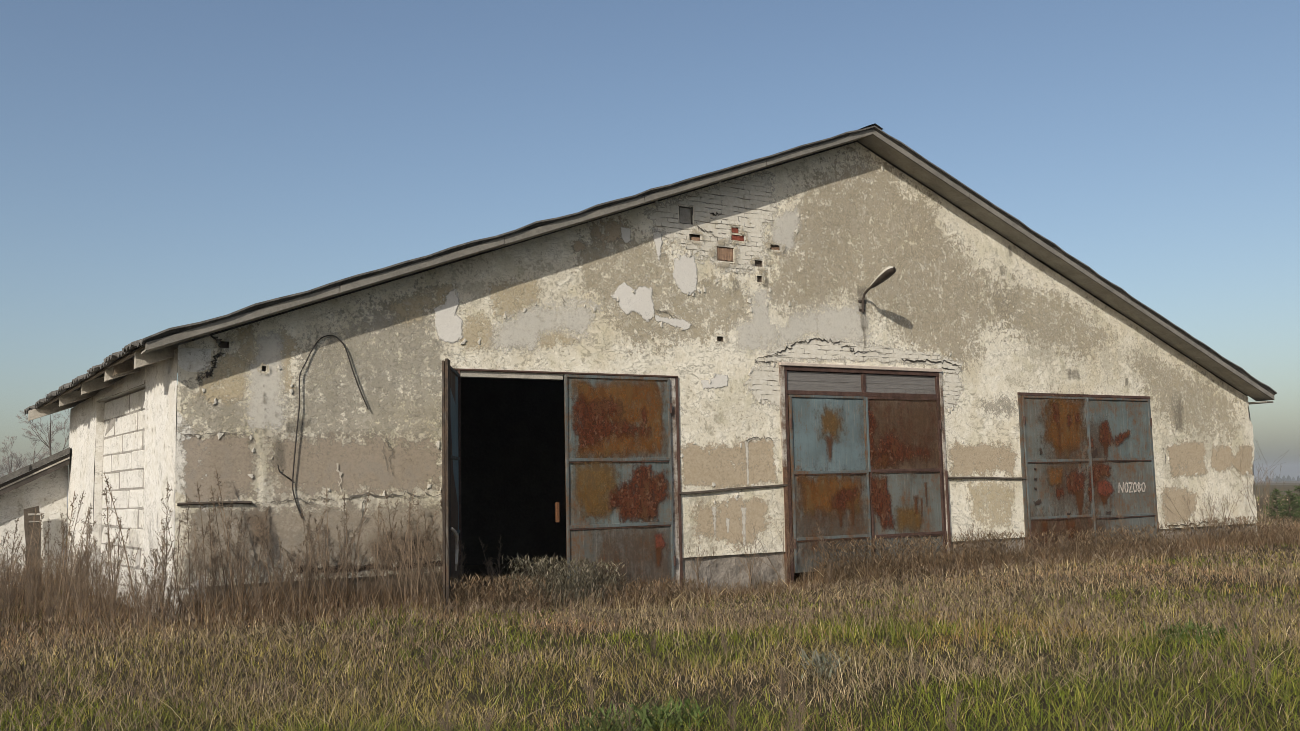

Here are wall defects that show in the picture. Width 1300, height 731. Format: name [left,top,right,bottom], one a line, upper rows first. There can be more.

flaking render [571,143,1014,413]
crack [196,330,225,386]
rust [572,379,670,566]
rust [799,404,935,534]
rust [1034,396,1131,545]